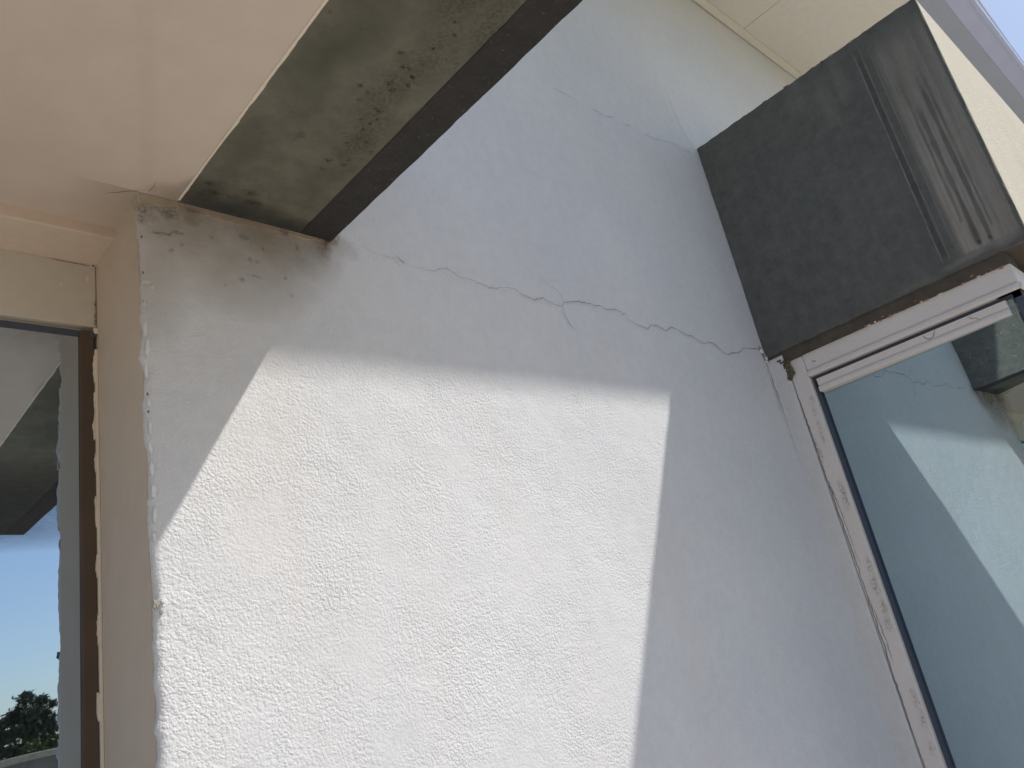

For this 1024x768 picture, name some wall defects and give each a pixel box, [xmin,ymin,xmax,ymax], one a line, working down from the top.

leakage [141,192,299,254]
leakage [905,72,1011,253]